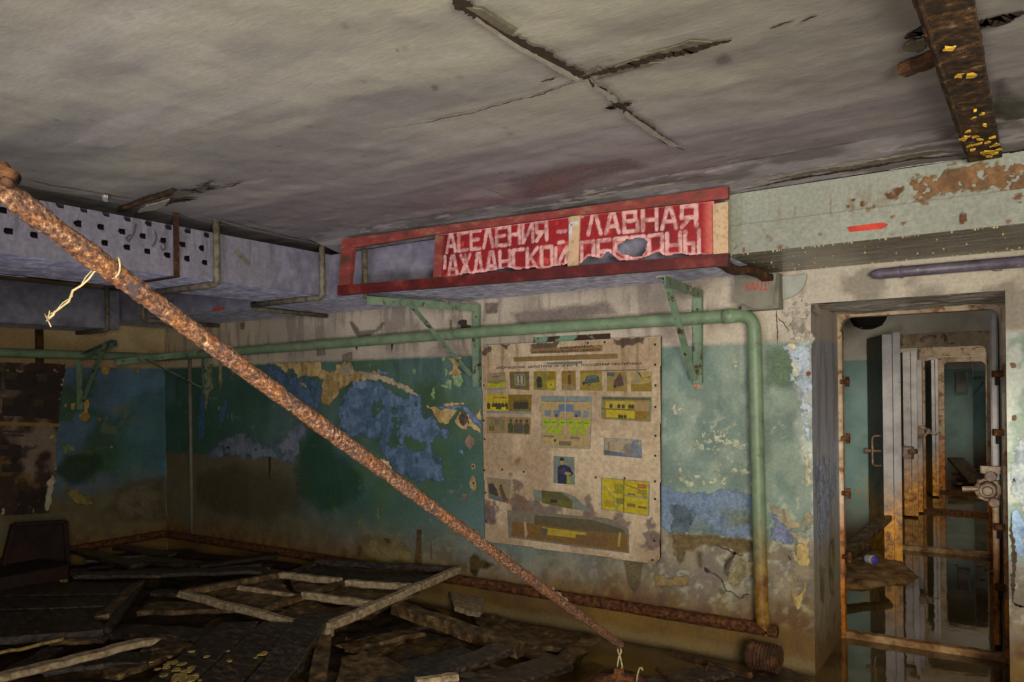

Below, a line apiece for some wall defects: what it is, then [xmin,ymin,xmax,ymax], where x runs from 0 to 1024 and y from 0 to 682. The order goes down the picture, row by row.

crack [902,27,927,53]
crack [979,11,1024,29]
crack [380,0,732,150]
crack [28,181,319,245]
peeling [206,420,307,464]
peeling [267,357,481,484]
peeling [771,295,837,609]
spalling [462,463,477,500]
crack [704,545,751,599]